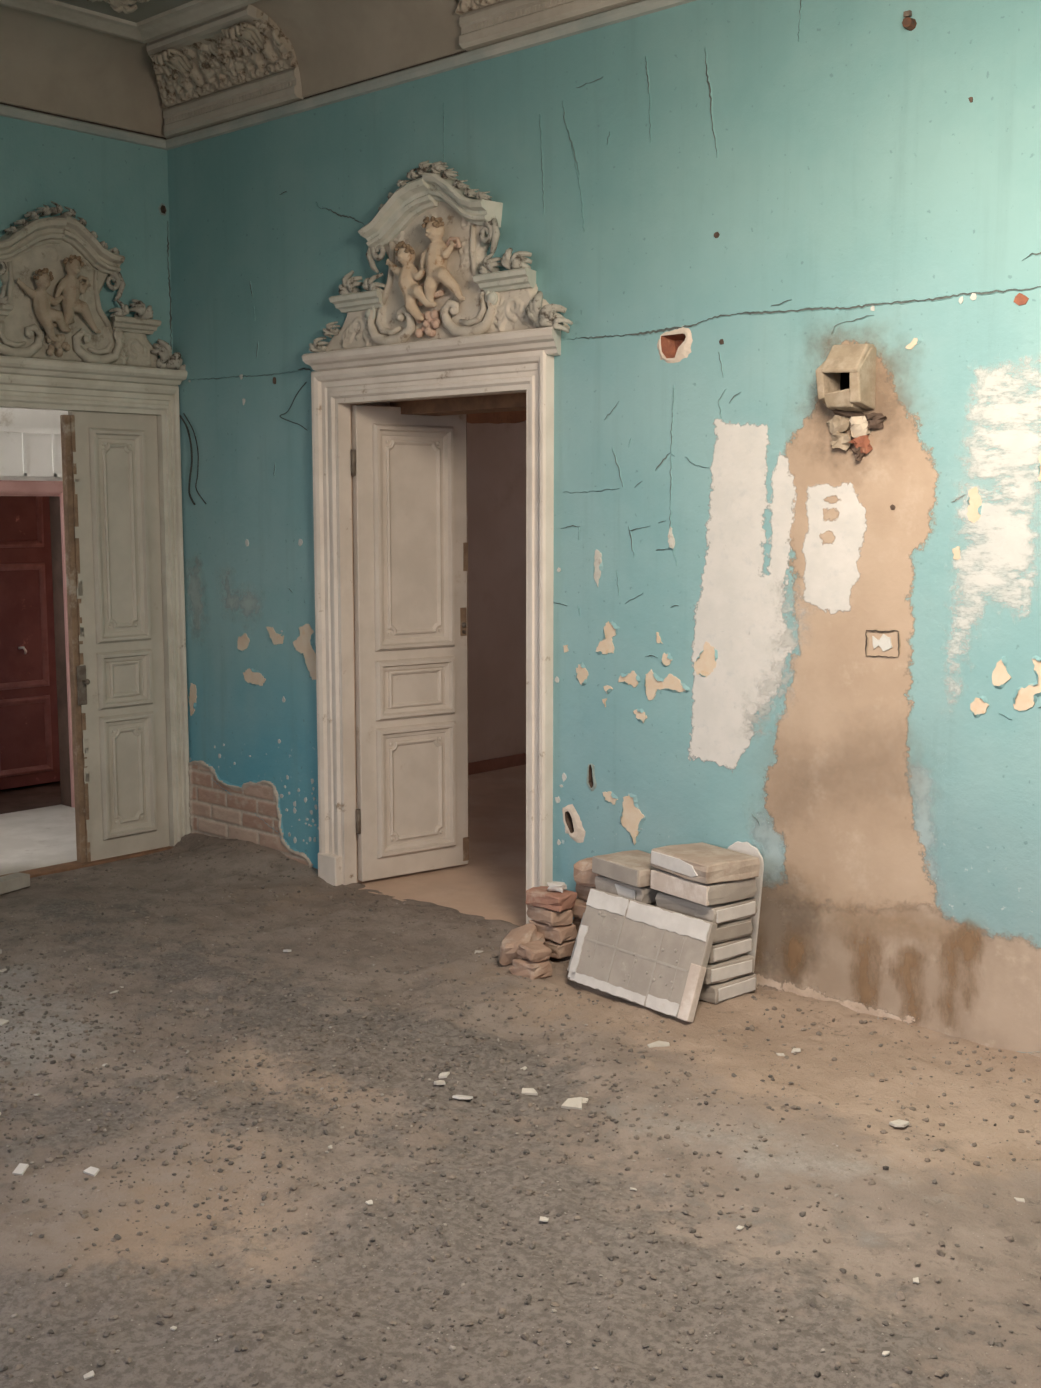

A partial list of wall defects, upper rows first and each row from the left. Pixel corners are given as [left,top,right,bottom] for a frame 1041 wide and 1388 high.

crack [539,77,610,231]
crack [705,47,718,158]
spalling [657,325,693,363]
crack [572,252,1041,420]
crack [565,386,709,608]
peeling [602,632,718,724]
flaking render [754,340,942,914]
peeling [970,655,1041,718]
flaking render [188,744,319,868]
spalling [555,773,585,845]
flaking render [756,973,915,1024]
damp [754,882,1041,1058]